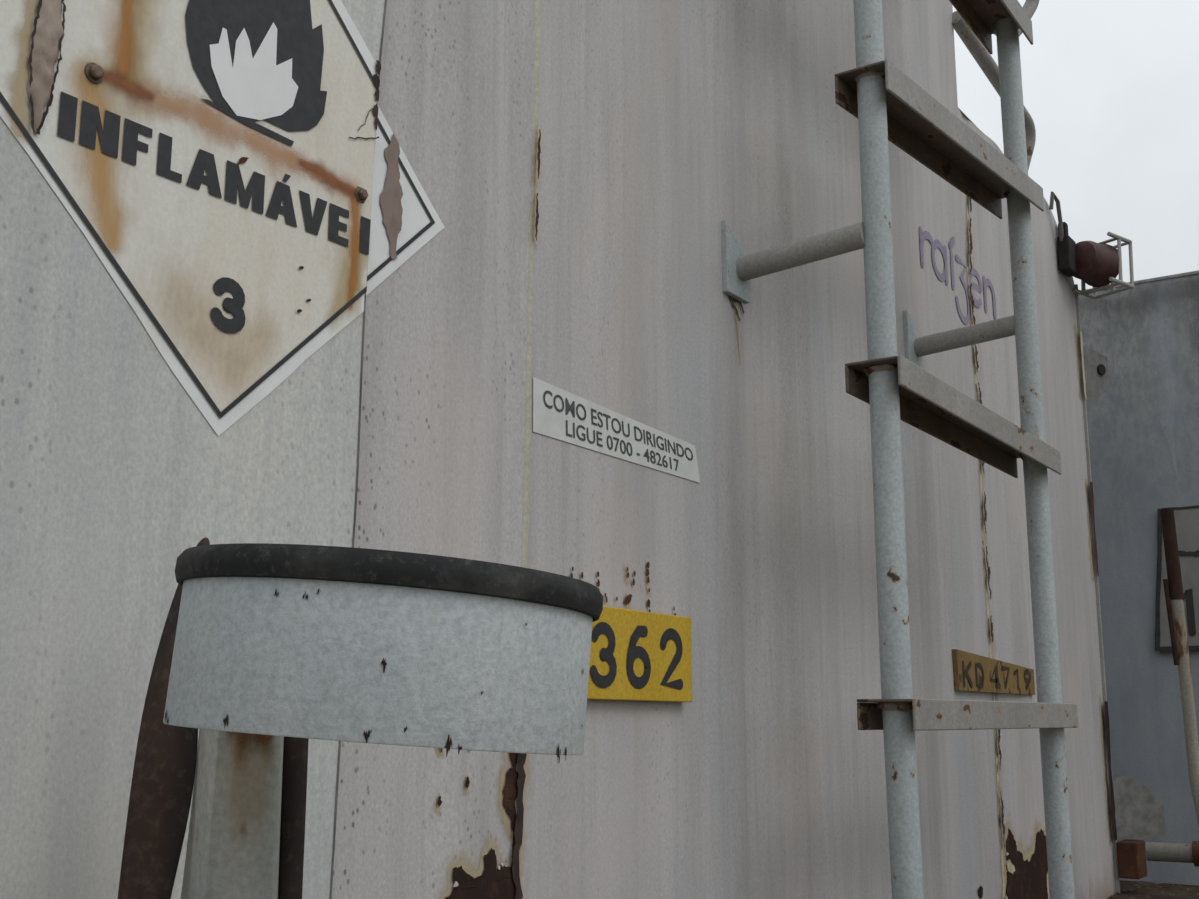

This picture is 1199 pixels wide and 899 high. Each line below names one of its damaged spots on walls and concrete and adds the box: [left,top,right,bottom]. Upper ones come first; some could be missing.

rust [570,562,651,612]